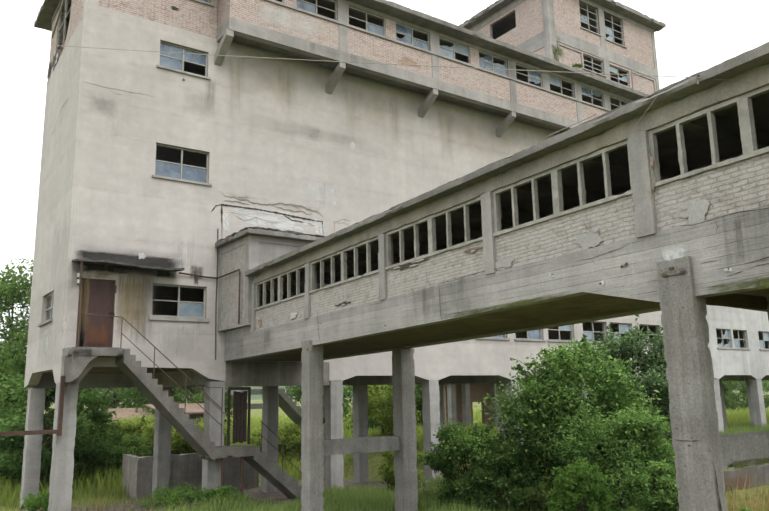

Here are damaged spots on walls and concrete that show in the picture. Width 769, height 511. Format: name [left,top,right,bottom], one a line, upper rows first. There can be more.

crack [211,192,352,236]
crack [701,256,769,288]